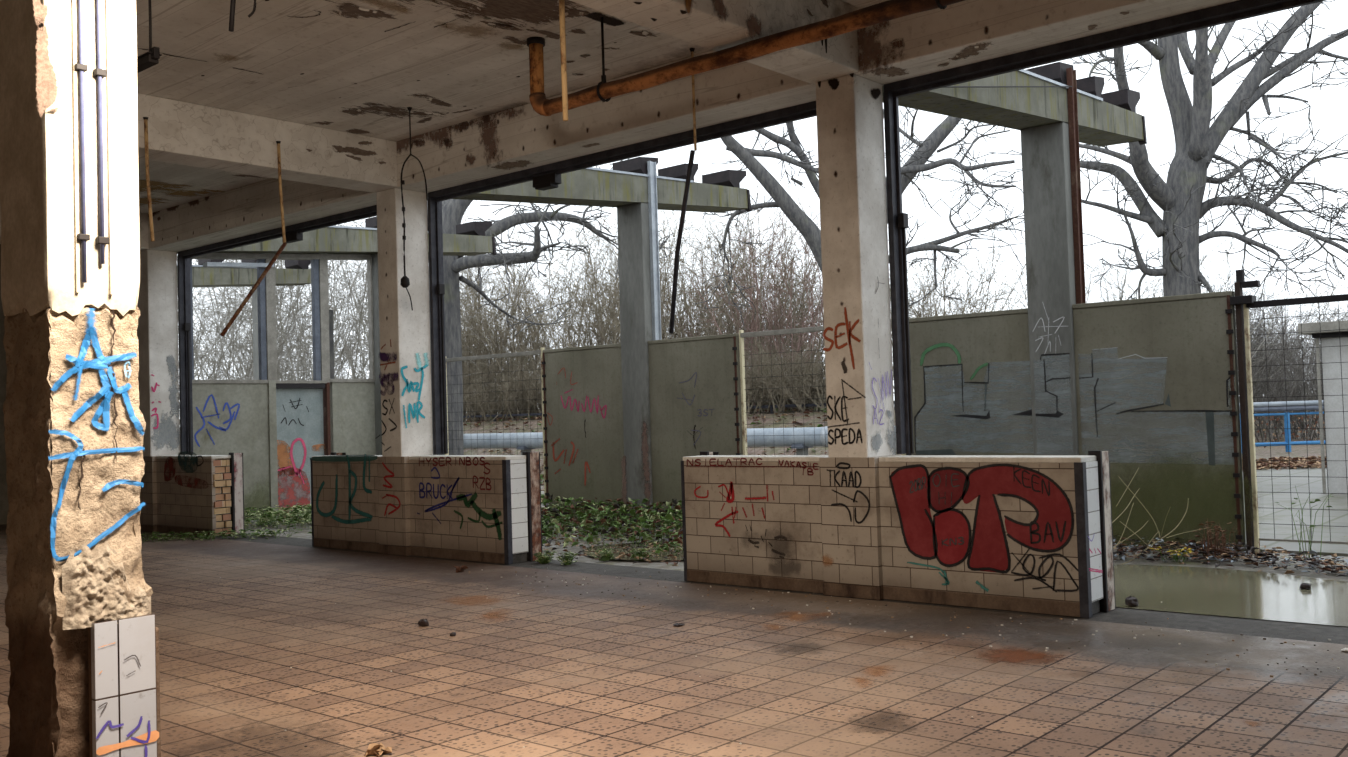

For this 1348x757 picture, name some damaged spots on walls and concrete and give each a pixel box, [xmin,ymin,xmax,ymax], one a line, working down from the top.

leakage [713,0,728,20]
leakage [747,15,761,37]
spalling [3,302,180,757]